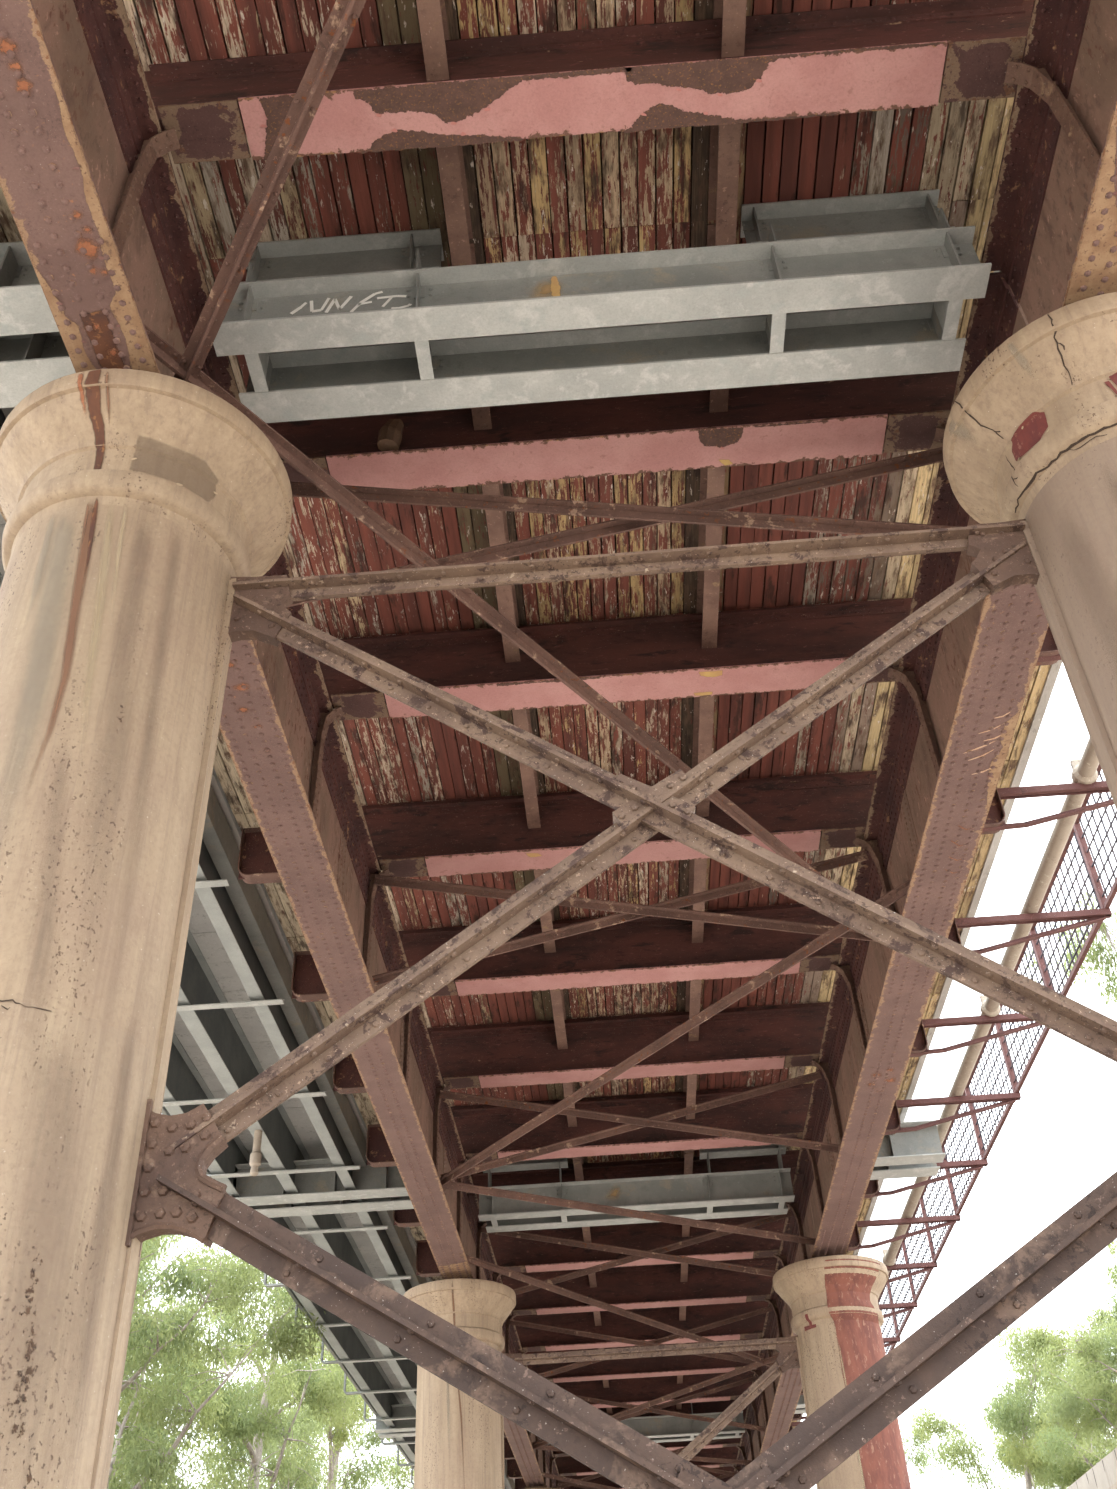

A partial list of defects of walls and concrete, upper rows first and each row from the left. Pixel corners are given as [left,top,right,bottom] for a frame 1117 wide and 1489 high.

rust [0,39,32,92]
peeling [259,96,294,161]
peeling [353,42,940,154]
crack [1048,315,1072,384]
crack [955,401,1117,513]
rust [47,499,98,737]
crack [0,999,52,1012]
peeling [804,1259,886,1387]
peeling [858,1418,911,1489]